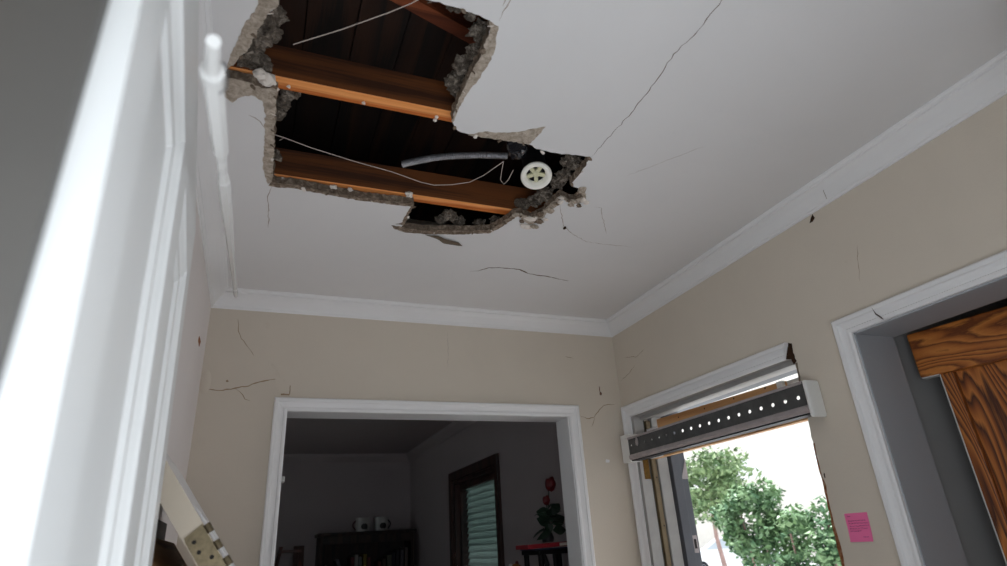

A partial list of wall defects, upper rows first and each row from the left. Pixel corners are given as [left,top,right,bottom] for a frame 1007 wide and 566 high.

flaking render [224,0,587,246]
crack [595,0,722,153]
crack [479,267,567,281]
crack [209,379,274,401]
flaking render [813,443,845,566]